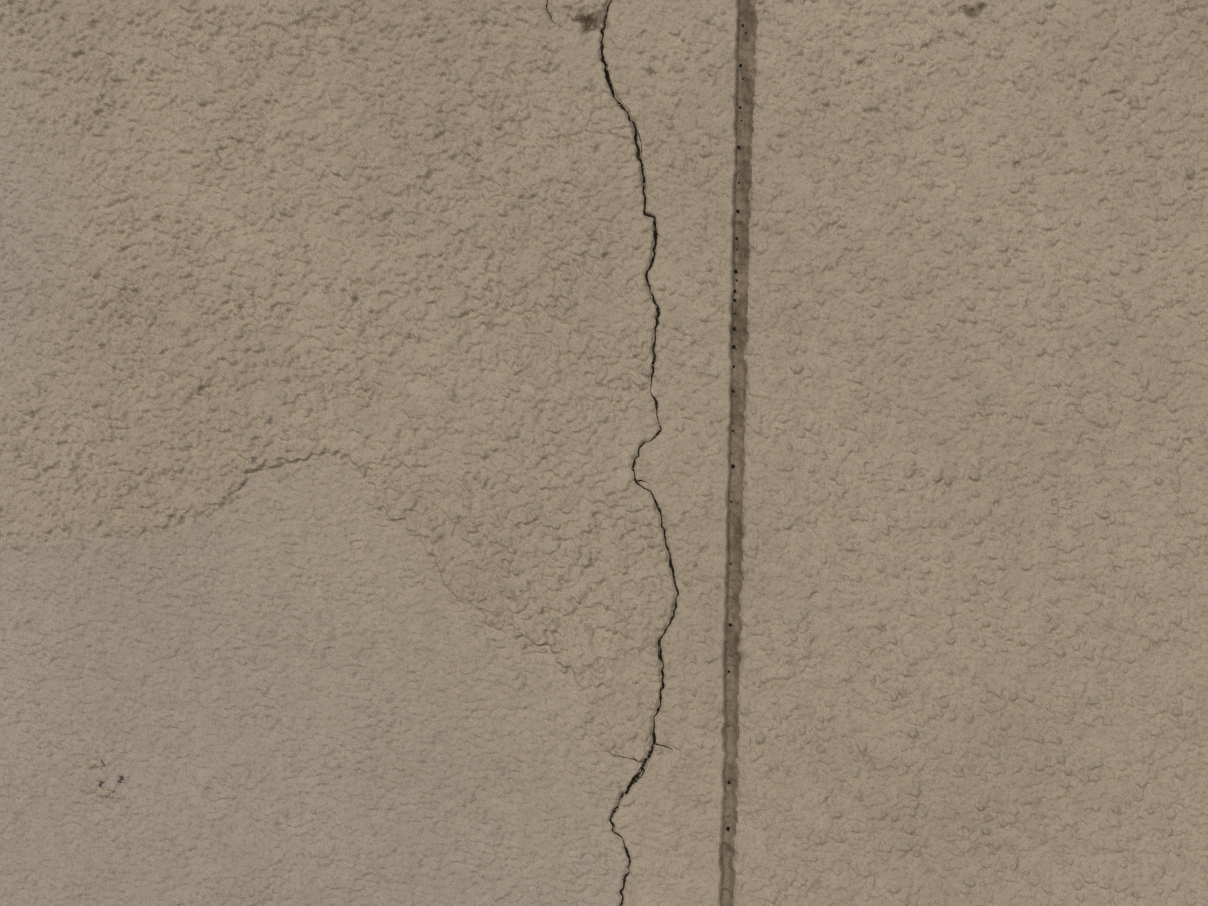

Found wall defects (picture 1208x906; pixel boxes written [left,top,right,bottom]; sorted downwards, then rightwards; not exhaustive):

flaking render [0,446,646,906]
crack [600,0,679,906]